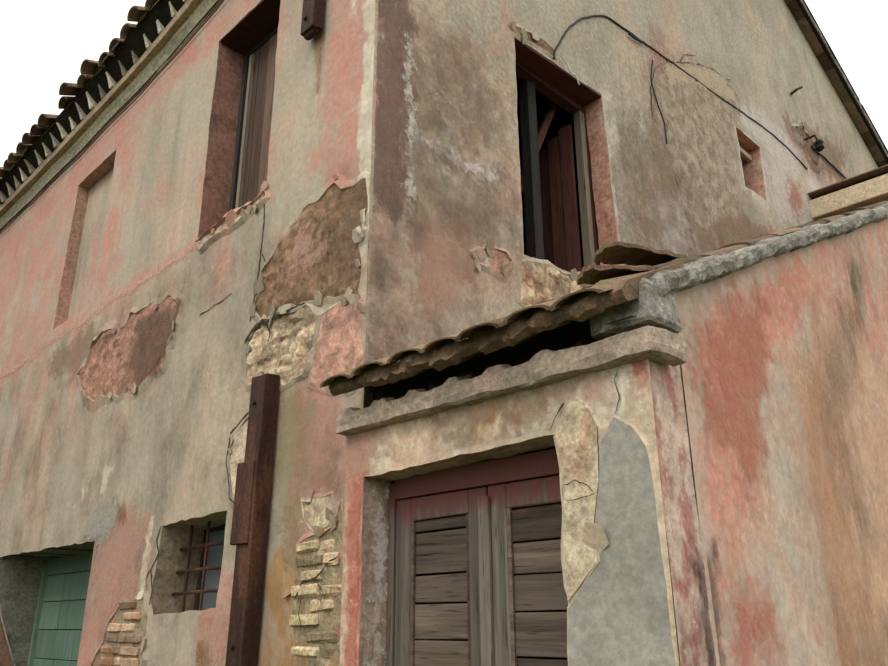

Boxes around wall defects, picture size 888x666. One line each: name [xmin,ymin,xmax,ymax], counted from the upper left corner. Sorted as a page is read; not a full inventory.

flaking render [511,21,557,61]
flaking render [195,181,271,255]
flaking render [243,171,371,399]
damp [373,0,501,226]
flaking render [469,239,591,308]
peeling [641,54,822,261]
peeling [76,287,185,413]
peeling [0,607,16,666]
flaking render [89,591,153,666]
flaking render [281,487,345,666]
peeling [553,395,679,666]
damp [692,538,725,666]